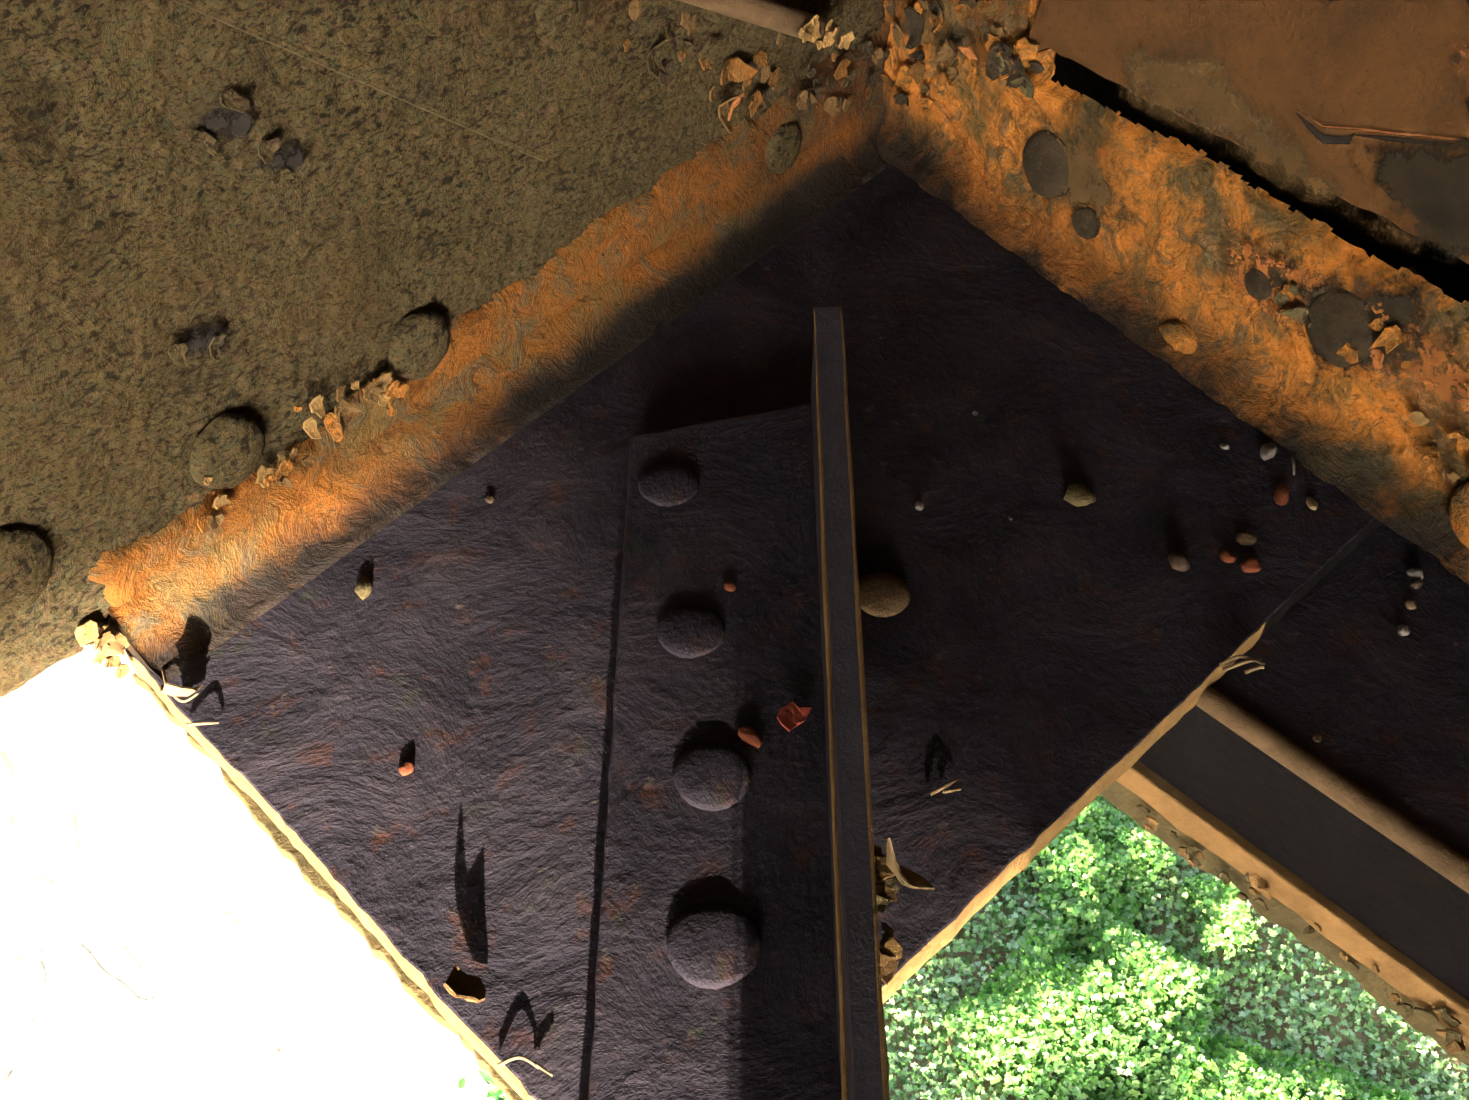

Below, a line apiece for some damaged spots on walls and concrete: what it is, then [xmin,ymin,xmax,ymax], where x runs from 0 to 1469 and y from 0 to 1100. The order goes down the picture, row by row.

peeling [1123,42,1341,201]
peeling [1011,111,1133,246]
rust [1273,284,1325,328]
peeling [1216,212,1469,486]
rust [1336,292,1410,369]
rust [255,372,409,488]
rust [1410,411,1430,426]
rust [1420,430,1469,483]
rust [188,476,234,544]